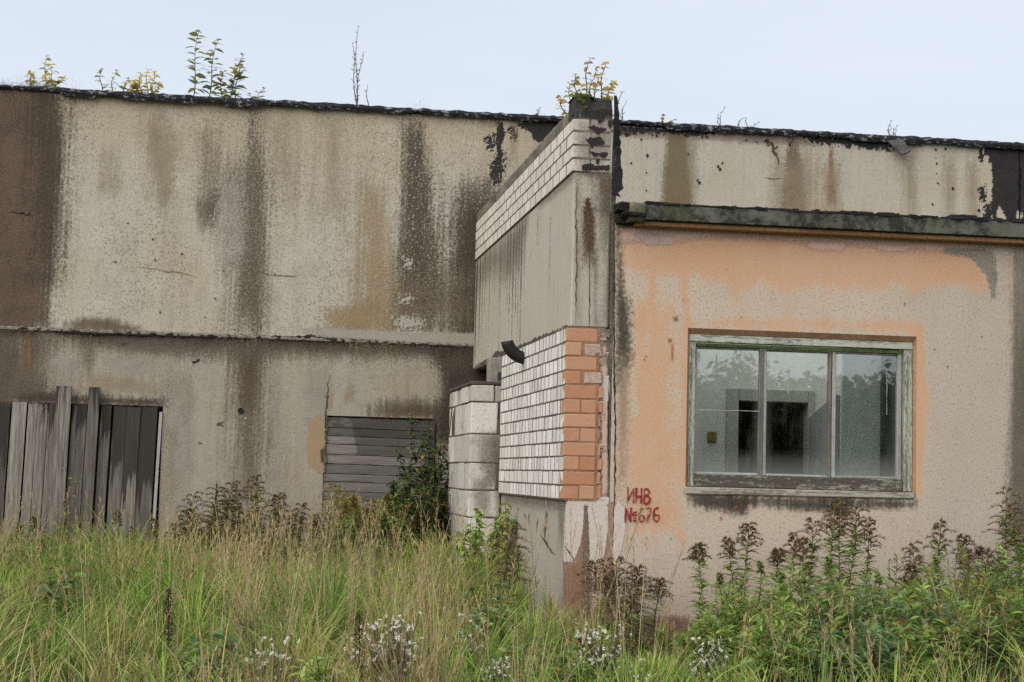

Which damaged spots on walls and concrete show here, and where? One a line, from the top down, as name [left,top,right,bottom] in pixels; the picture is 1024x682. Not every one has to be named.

peeling [483,121,559,187]
water stain [662,130,693,204]
water stain [782,139,806,211]
peeling [977,147,1024,219]
water stain [0,80,538,503]
rust [582,197,596,263]
water stain [599,180,631,376]
peeling [617,227,1005,297]
crack [10,192,616,531]
water stain [1010,258,1024,537]
water stain [564,505,590,619]